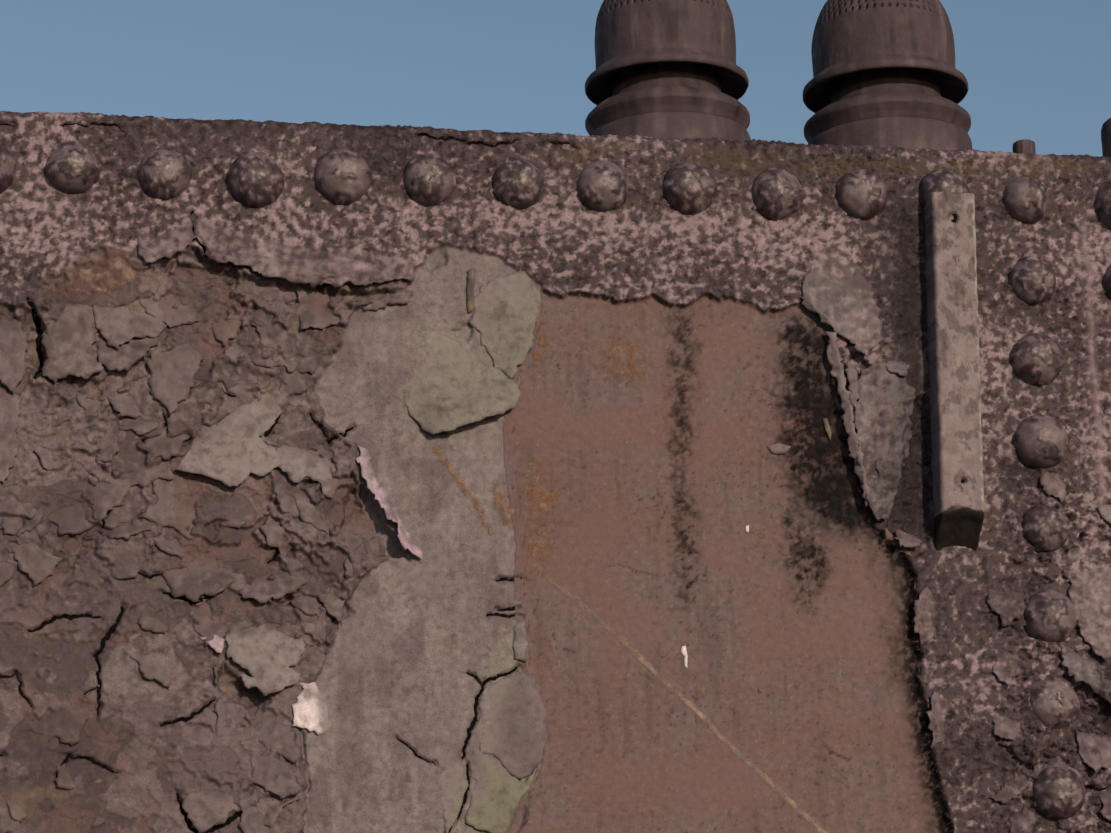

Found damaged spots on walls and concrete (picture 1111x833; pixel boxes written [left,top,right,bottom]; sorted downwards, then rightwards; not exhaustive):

peeling [135,213,415,330]
peeling [403,268,542,434]
damp [779,323,864,534]
peeling [801,244,916,521]
crack [28,606,124,716]
peeling [0,294,369,833]
crack [486,576,522,618]
corrosion [495,284,949,833]
damp [791,529,826,591]
peeling [1059,547,1111,704]
crack [176,793,243,833]
crack [396,666,518,833]